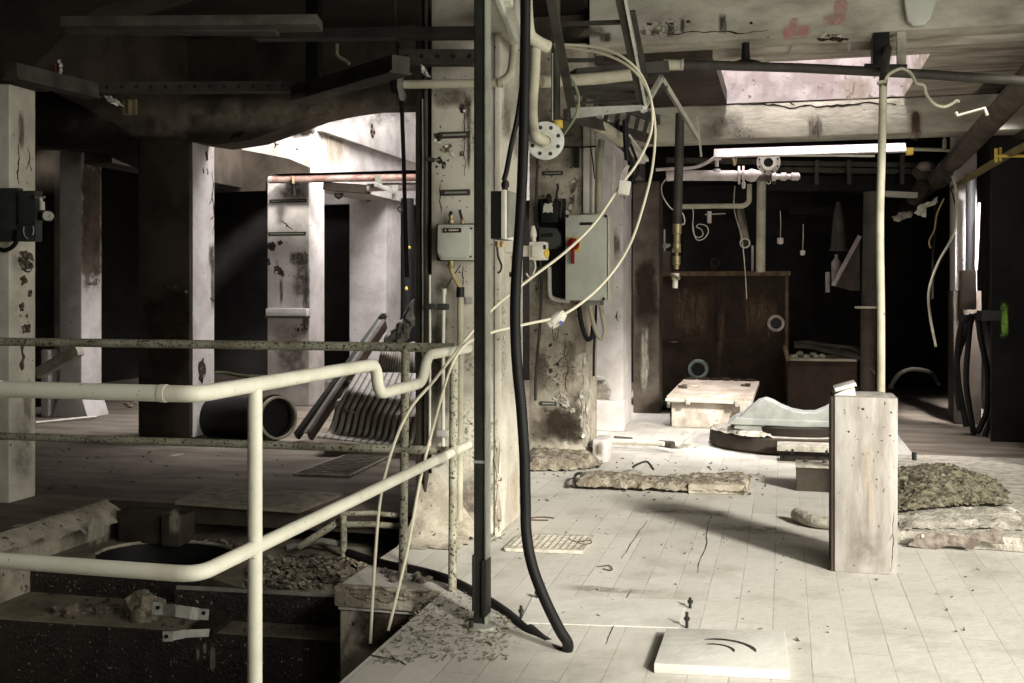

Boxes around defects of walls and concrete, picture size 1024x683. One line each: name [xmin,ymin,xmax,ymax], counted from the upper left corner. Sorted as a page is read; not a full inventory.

crack [643,29,767,37]
spalling [817,32,849,42]
crack [732,83,896,109]
crack [17,144,32,184]
spalling [267,240,285,277]
peeling [18,250,34,371]
peeling [553,337,591,448]
damp [533,396,581,443]